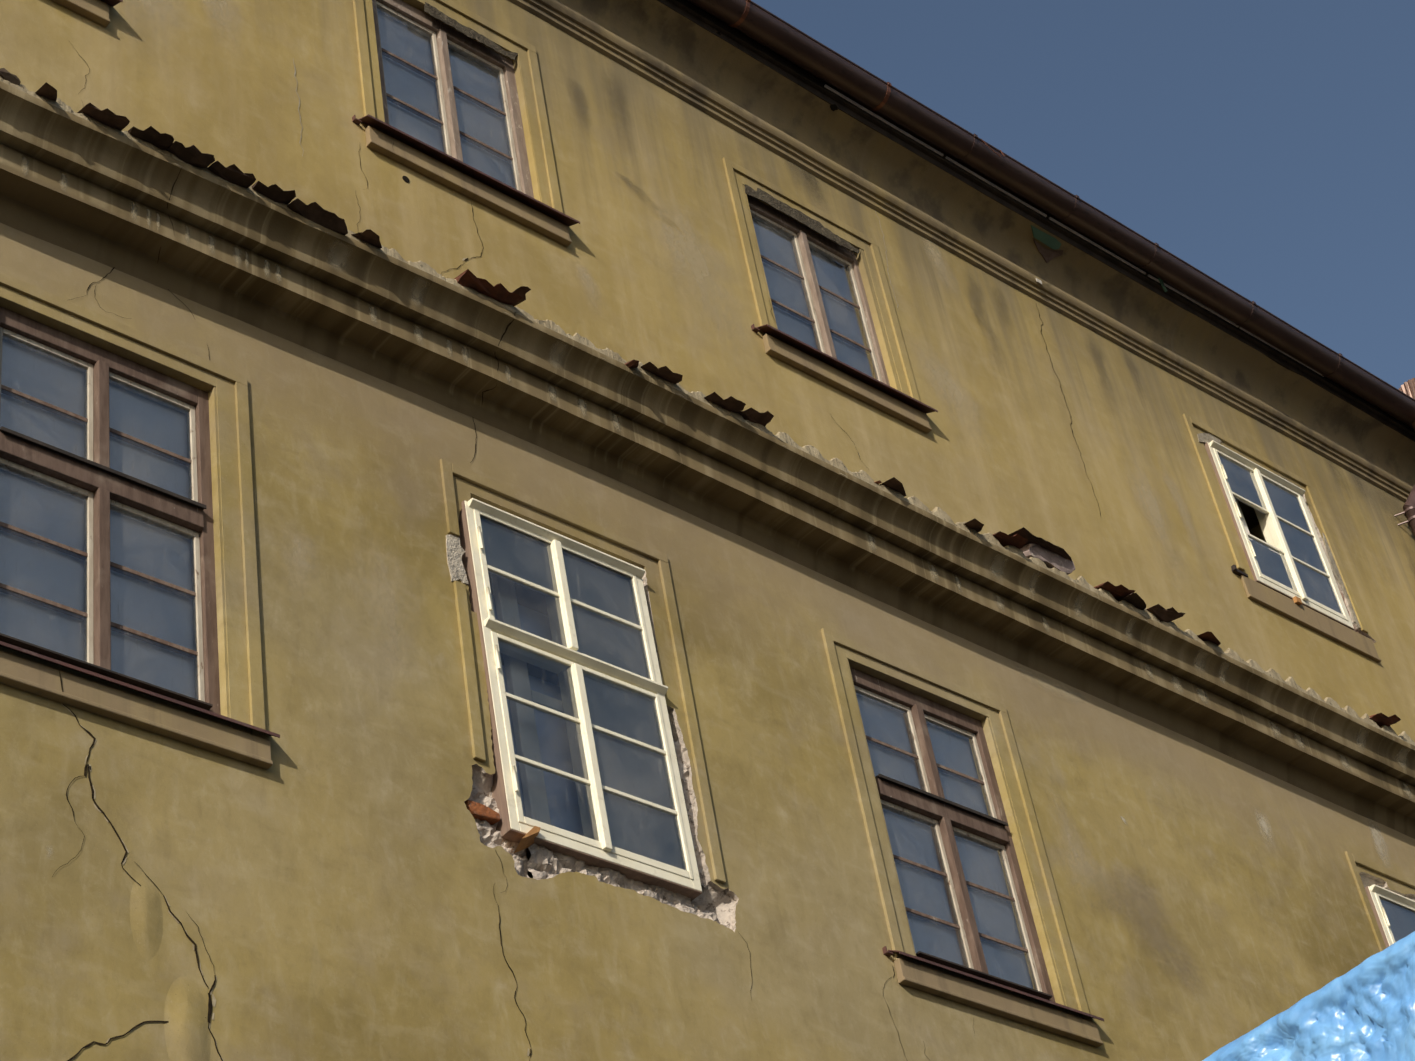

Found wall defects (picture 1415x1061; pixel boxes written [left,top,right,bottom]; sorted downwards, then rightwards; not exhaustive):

spalling [446,534,468,585]
crack [52,671,224,1061]
crack [493,852,532,1061]
spalling [464,742,735,930]